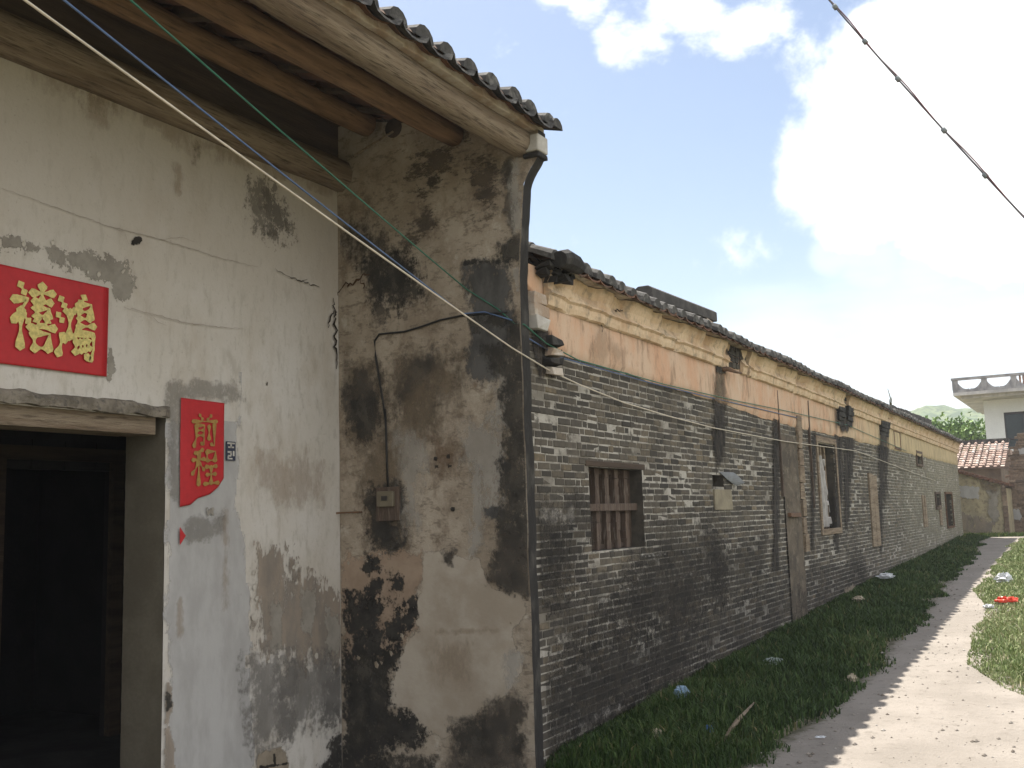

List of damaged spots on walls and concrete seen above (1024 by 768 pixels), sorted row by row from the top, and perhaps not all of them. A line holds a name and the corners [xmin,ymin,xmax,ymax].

peeling [0,234,137,302]
crack [4,189,370,369]
damp [242,174,298,247]
damp [340,134,521,325]
peeling [106,348,115,382]
damp [465,315,529,601]
peeling [250,541,423,676]
damp [241,631,527,768]